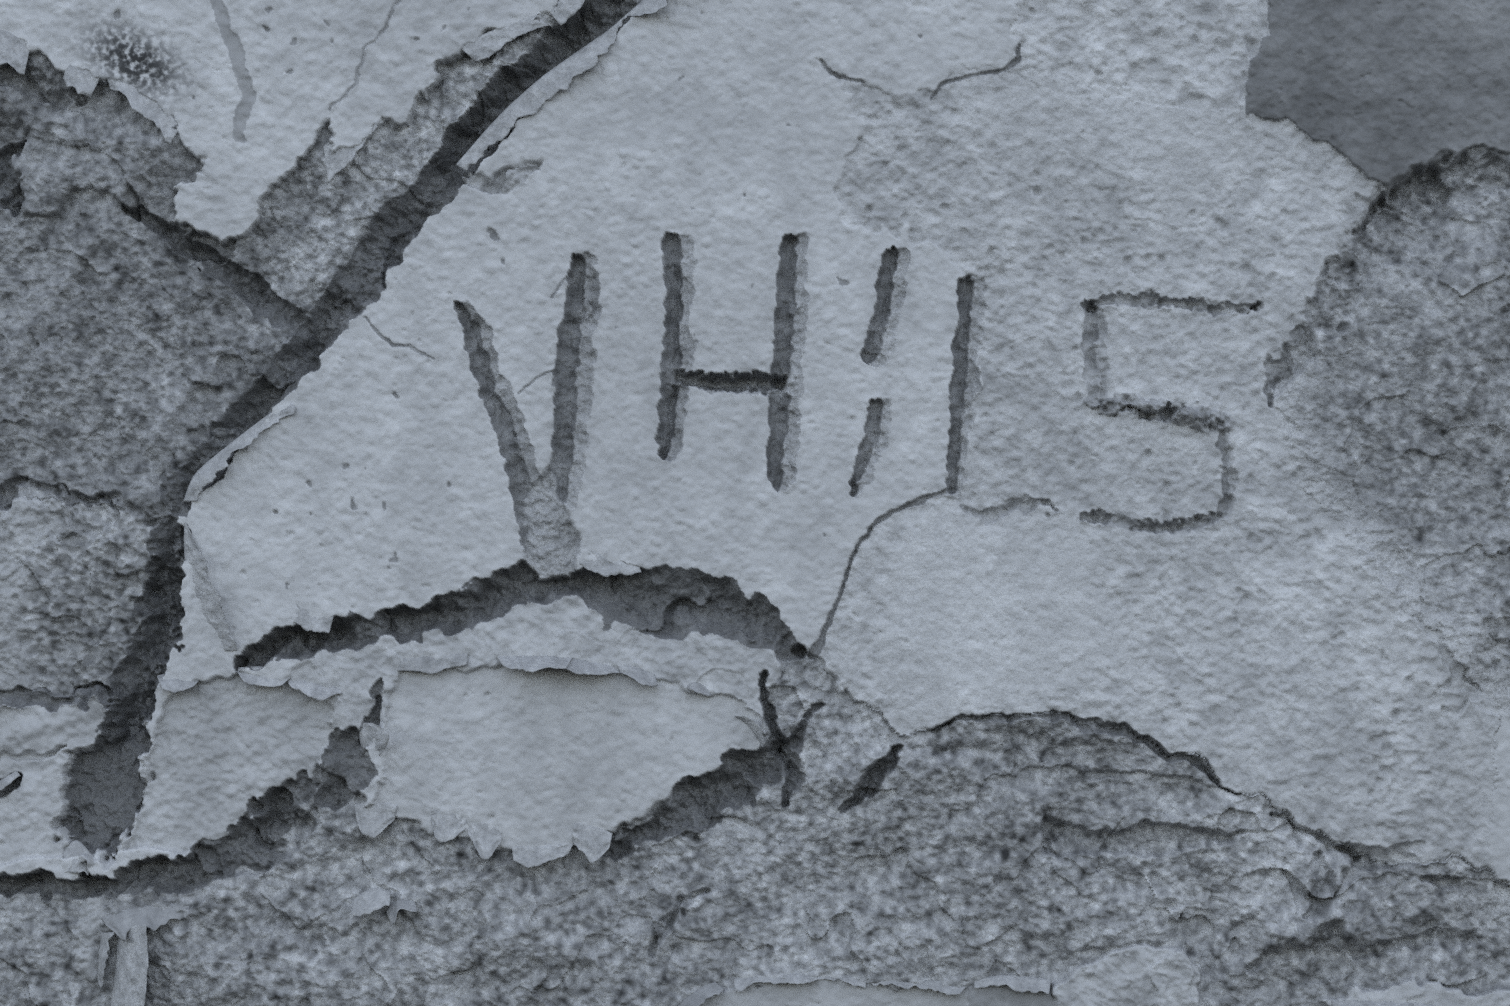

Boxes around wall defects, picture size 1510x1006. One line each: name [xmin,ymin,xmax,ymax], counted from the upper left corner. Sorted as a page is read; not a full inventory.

spalling [0,4,559,507]
crack [60,0,950,899]
crack [931,44,1022,101]
spalling [1270,145,1510,716]
spalling [0,654,1510,1006]